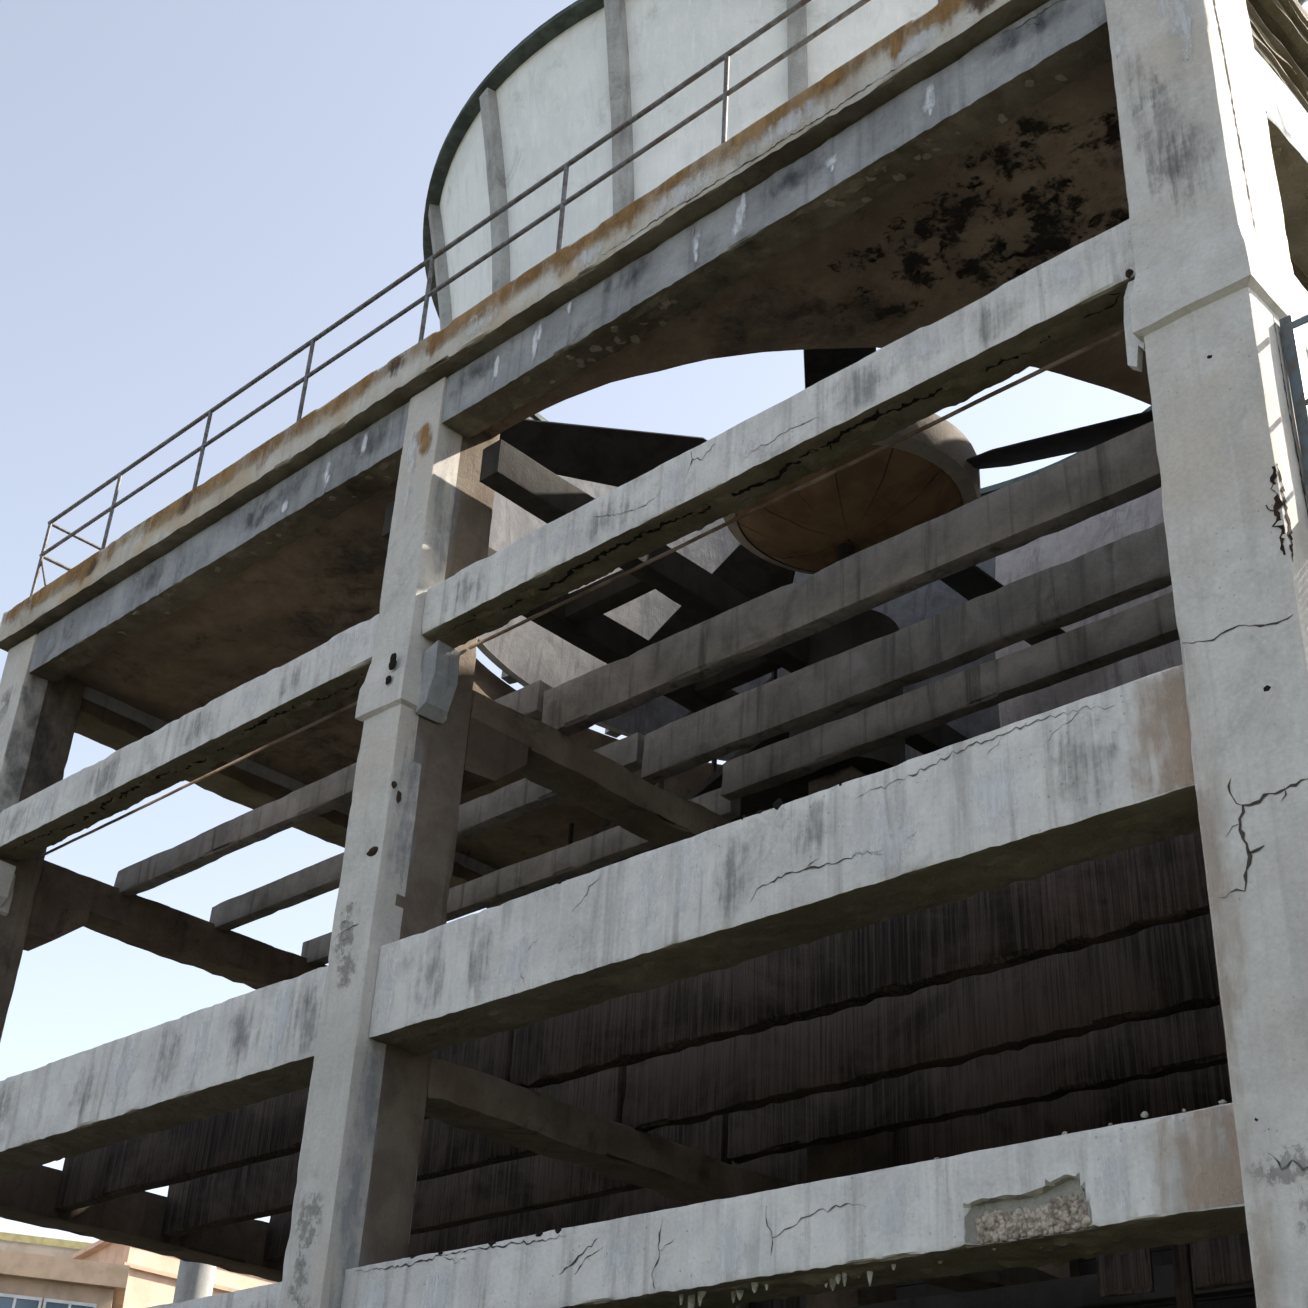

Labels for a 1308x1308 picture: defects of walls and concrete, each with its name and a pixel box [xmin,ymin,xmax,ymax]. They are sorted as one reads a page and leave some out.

corrosion [414,0,993,355]
corrosion [149,357,401,527]
corrosion [416,423,431,454]
crack [1273,316,1308,513]
crack [452,387,943,630]
crack [1182,614,1294,644]
crack [750,832,916,902]
crack [1218,778,1308,898]
damp [679,1291,707,1308]
damp [731,1282,768,1303]
damp [824,1271,873,1291]
spalling [594,1177,1248,1308]